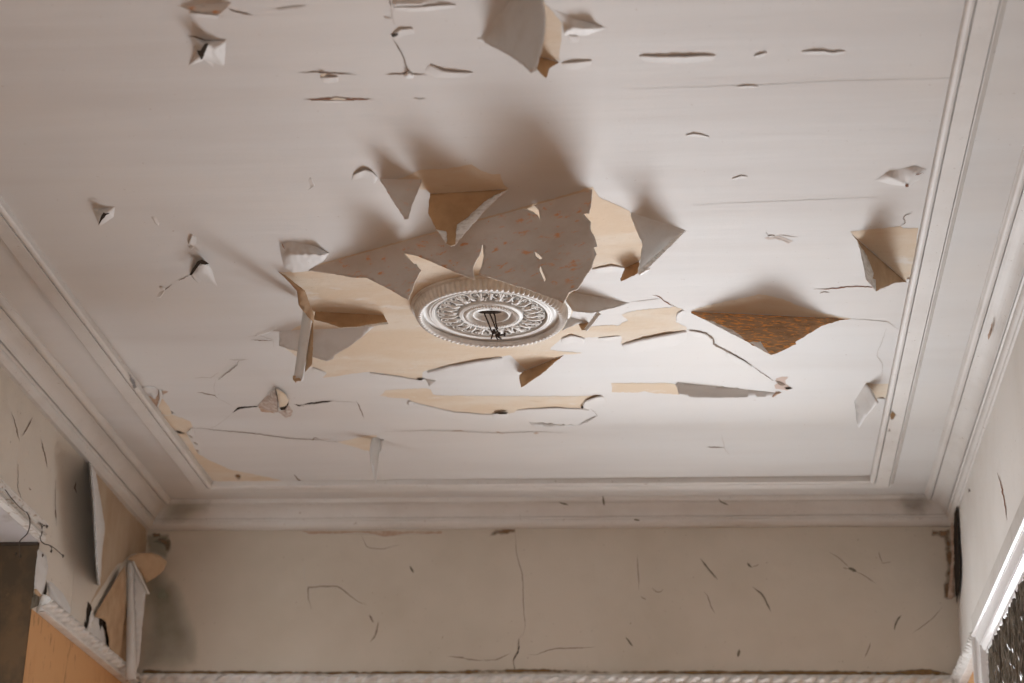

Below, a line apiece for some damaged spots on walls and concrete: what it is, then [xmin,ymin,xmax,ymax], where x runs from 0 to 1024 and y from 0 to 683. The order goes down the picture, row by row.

peeling [477,0,607,78]
peeling [156,234,217,298]
peeling [279,164,850,428]
peeling [851,213,918,291]
peeling [143,386,280,481]
crack [198,381,330,442]
crack [294,401,364,417]
peeling [854,383,888,428]
peeling [88,462,167,681]
crack [449,536,592,673]